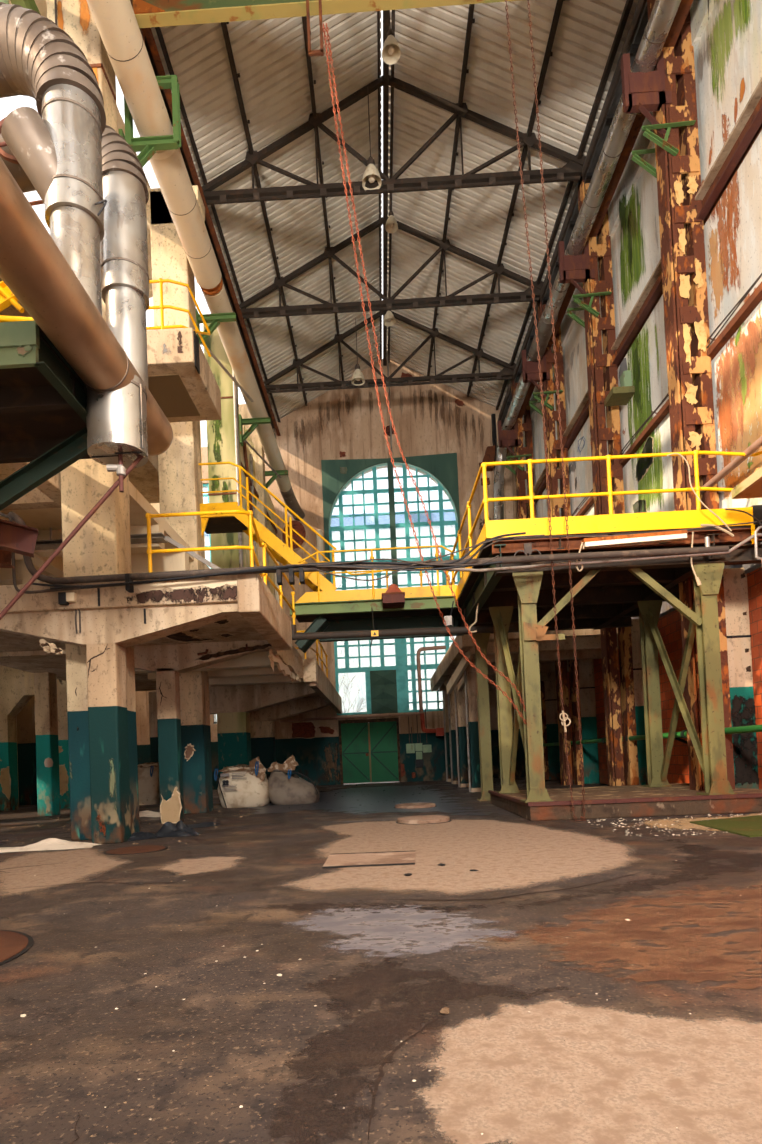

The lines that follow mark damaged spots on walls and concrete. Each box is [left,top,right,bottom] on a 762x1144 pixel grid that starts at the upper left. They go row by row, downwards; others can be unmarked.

damp [739,0,751,29]
damp [711,43,719,96]
peeling [674,175,698,206]
damp [620,185,643,302]
peeling [678,228,704,299]
rust [709,171,740,317]
peeling [683,320,707,365]
peeling [684,382,698,405]
rust [719,311,762,497]
peeling [688,431,702,450]
damp [248,743,762,1144]